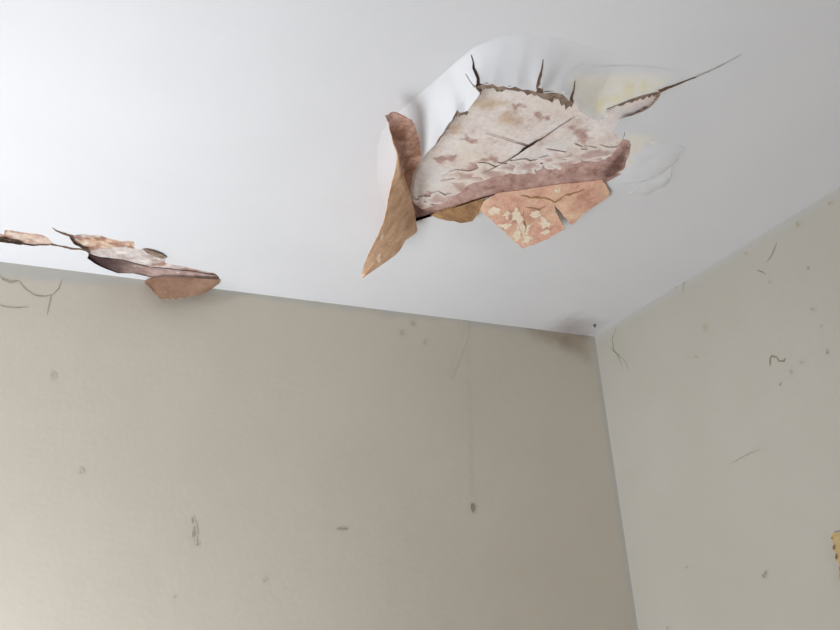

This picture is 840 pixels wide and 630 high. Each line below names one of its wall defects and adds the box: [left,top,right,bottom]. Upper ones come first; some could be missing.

spalling [361,55,661,278]
crack [0,276,62,314]
peeling [0,228,220,300]